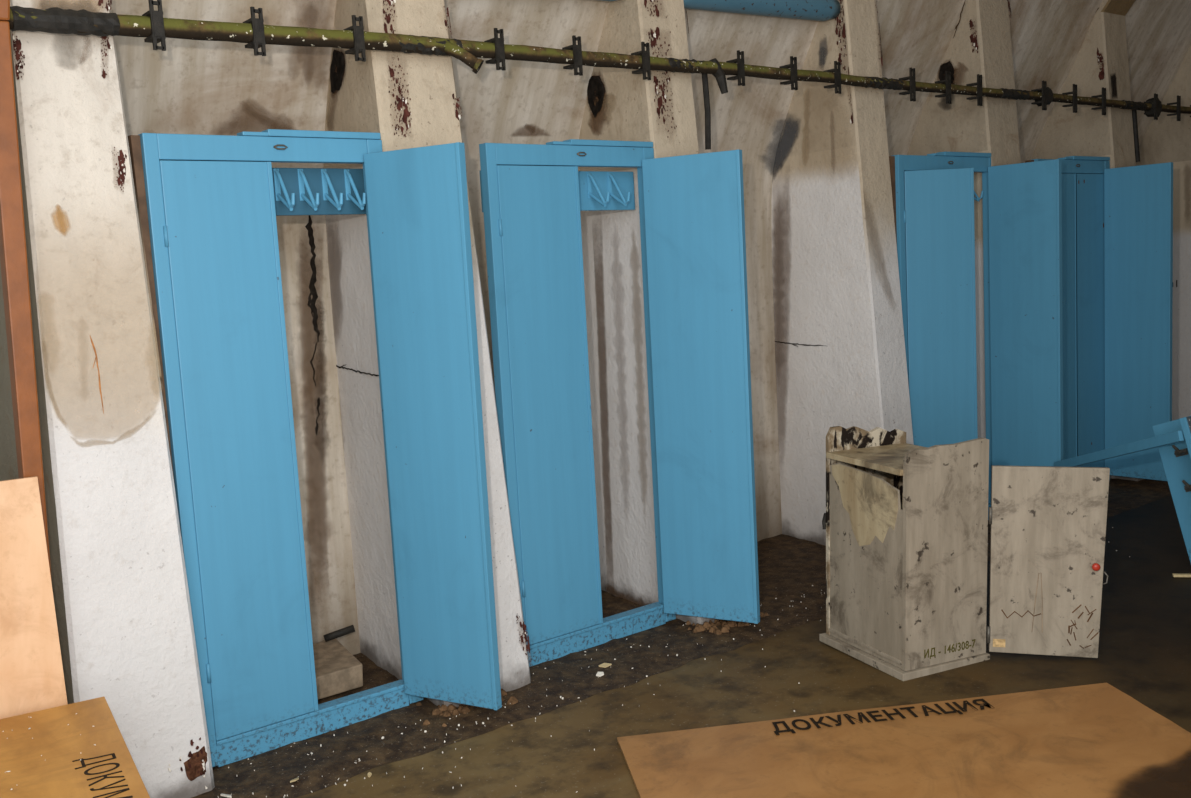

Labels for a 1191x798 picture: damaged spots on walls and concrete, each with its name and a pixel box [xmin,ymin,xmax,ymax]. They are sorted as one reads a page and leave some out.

peeling [100,36,112,79]
peeling [113,147,127,192]
damp [769,118,799,175]
crack [305,215,379,435]